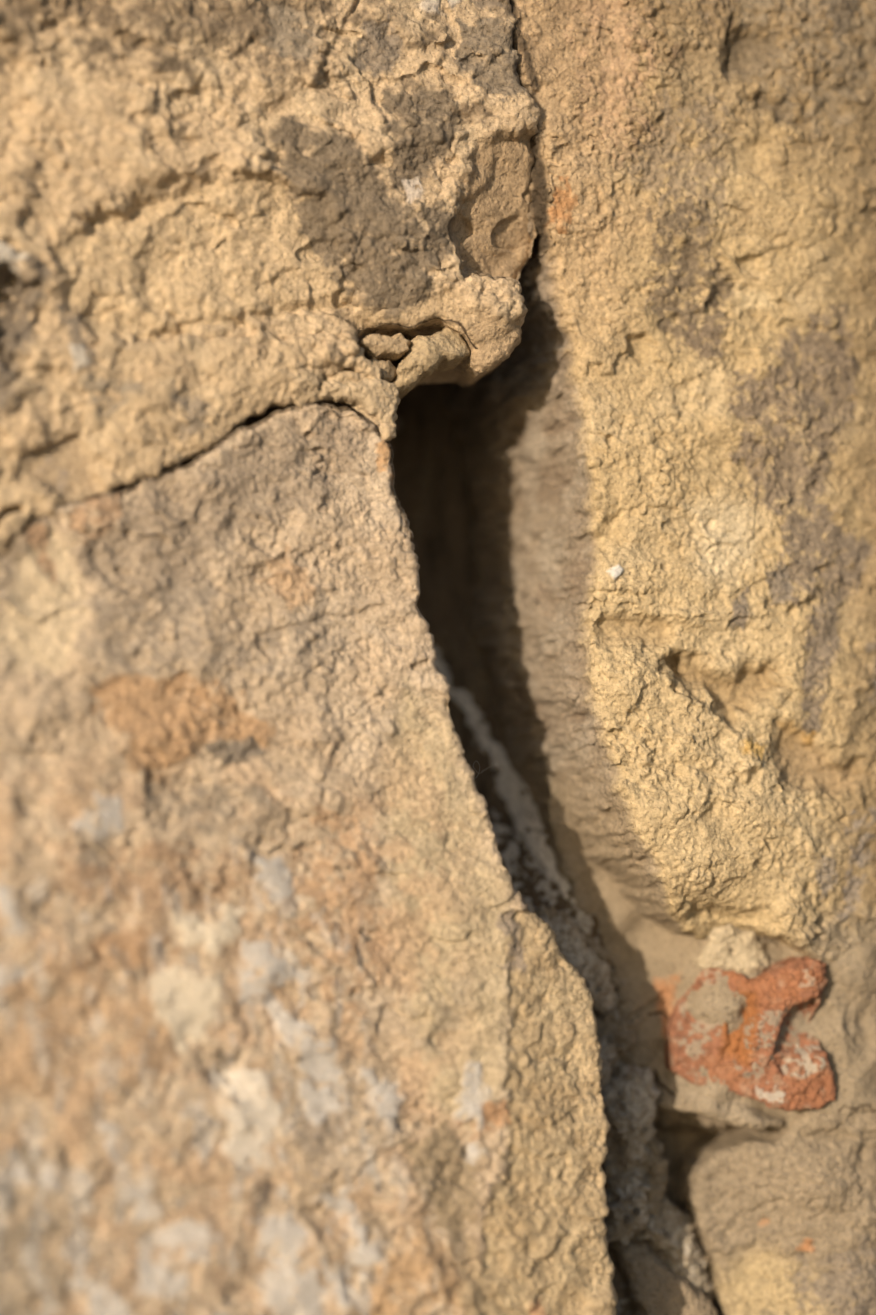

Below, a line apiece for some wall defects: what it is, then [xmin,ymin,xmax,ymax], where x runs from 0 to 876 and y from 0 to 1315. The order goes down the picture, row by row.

crack [723,0,735,71]
crack [509,0,554,260]
crack [0,312,478,558]
crack [647,1009,669,1019]
crack [652,1069,675,1097]
crack [837,1103,876,1113]